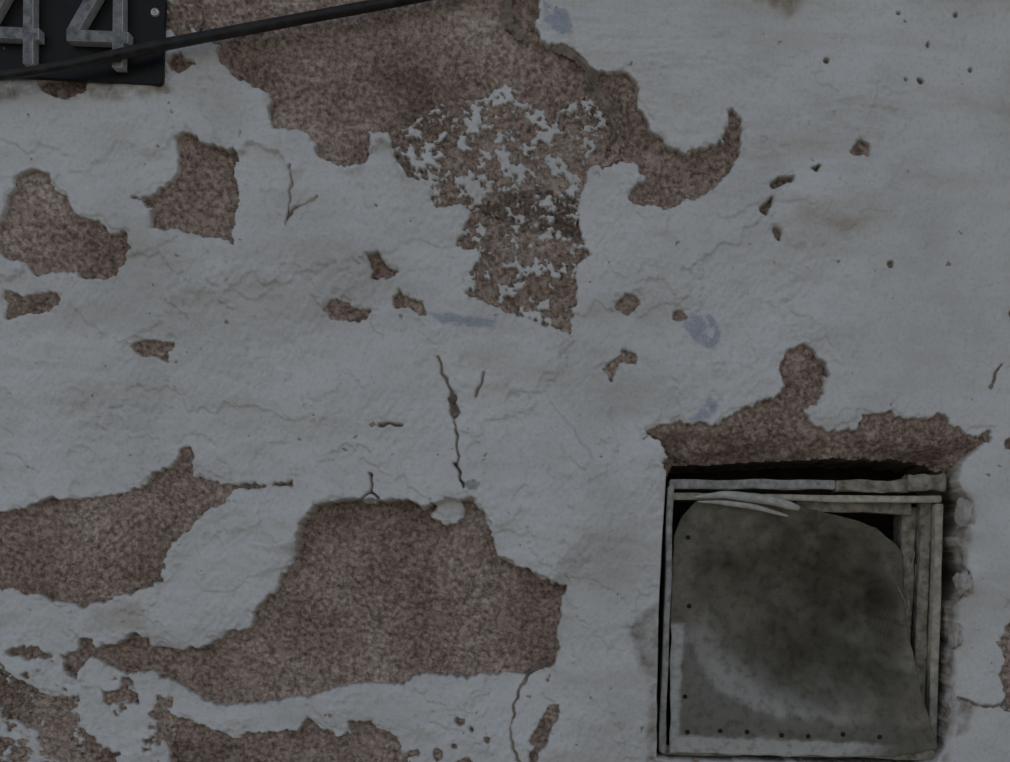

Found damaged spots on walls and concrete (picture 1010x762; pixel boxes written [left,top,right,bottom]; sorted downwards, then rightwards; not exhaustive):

flaking render [145,0,740,334]
flaking render [0,172,131,280]
crack [438,357,478,419]
flaking render [647,346,989,476]
flaking render [0,387,566,715]
flaking render [0,663,121,762]
flaking render [145,695,420,762]
crack [510,660,549,751]
flaking render [530,705,559,762]
flaking render [999,623,1010,706]